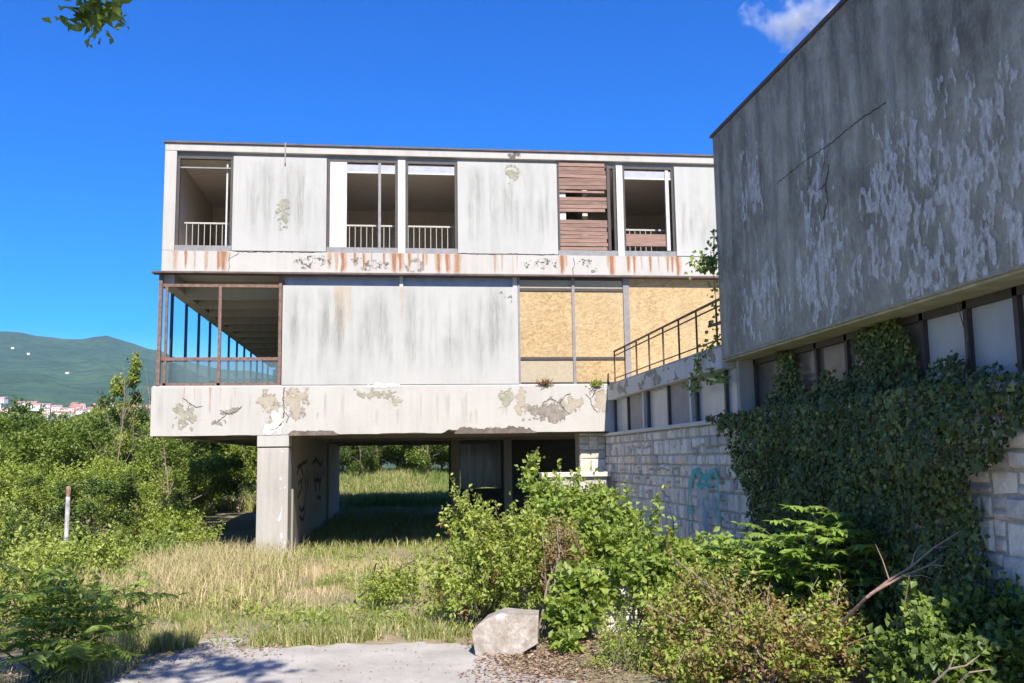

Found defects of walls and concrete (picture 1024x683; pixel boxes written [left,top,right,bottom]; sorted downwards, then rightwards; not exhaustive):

peeling [505,152,521,184]
crack [776,102,886,220]
peeling [274,199,290,230]
peeling [172,403,197,432]
peeling [211,407,239,426]
peeling [257,387,338,436]
peeling [353,382,403,406]
peeling [455,367,678,434]